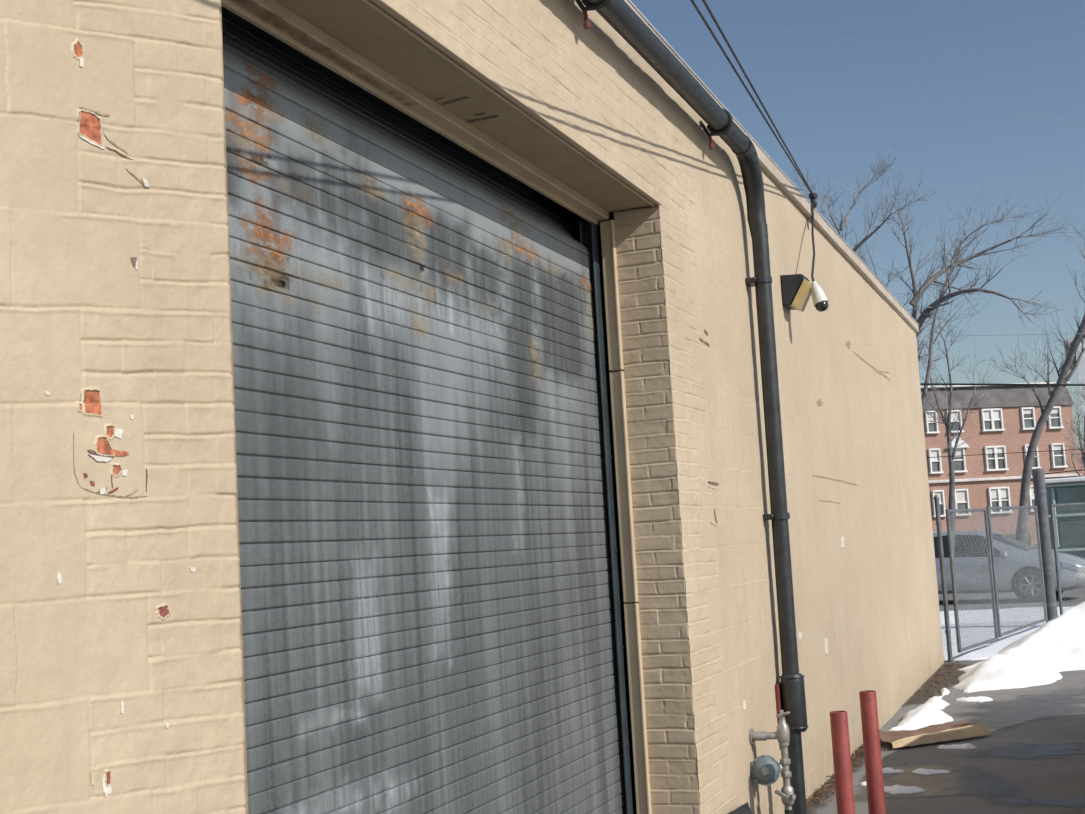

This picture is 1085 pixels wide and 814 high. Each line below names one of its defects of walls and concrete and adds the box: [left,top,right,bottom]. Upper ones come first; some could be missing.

peeling [71,38,84,67]
corrosion [226,63,274,150]
spalling [76,107,150,188]
leakage [288,161,356,224]
corrosion [243,205,292,273]
leakage [365,199,582,438]
peeling [74,386,148,499]
peeling [155,603,171,621]